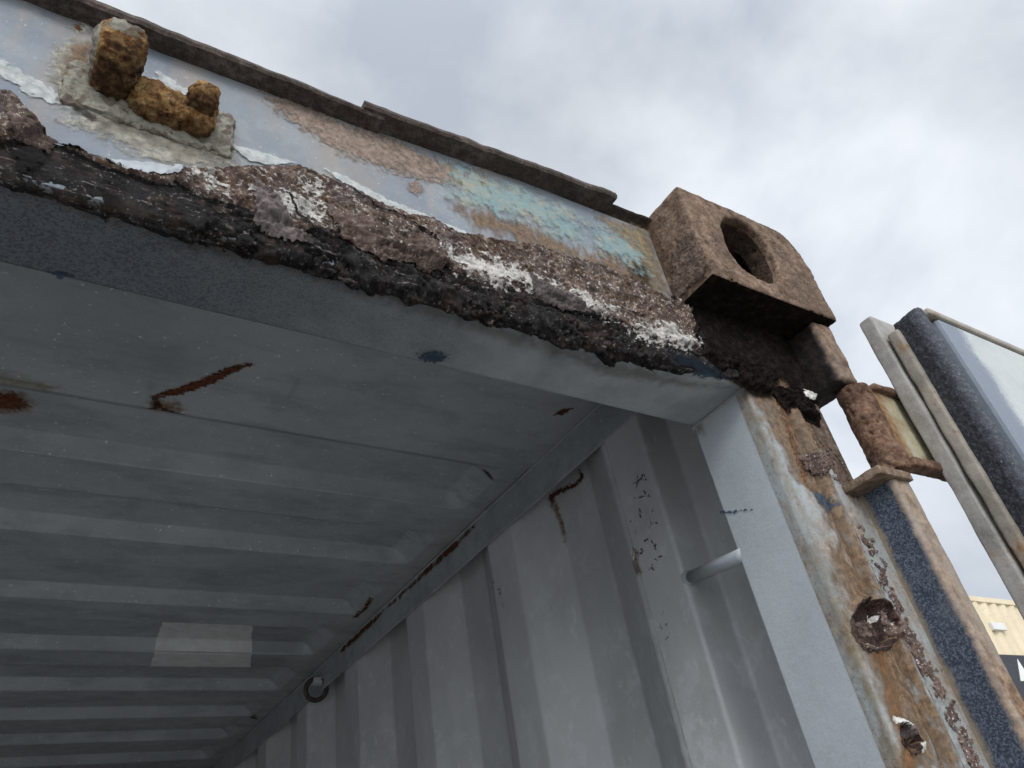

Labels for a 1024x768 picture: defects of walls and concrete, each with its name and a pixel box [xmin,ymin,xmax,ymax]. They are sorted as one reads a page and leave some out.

rust [5,103,58,153]
rust [111,159,185,175]
rust [253,178,314,244]
rust [328,204,455,273]
peeling [259,89,654,276]
rust [454,205,675,300]
rust [529,272,592,313]
rust [0,391,31,413]
rust [146,363,253,415]
rust [549,470,584,534]
rust [755,383,985,768]